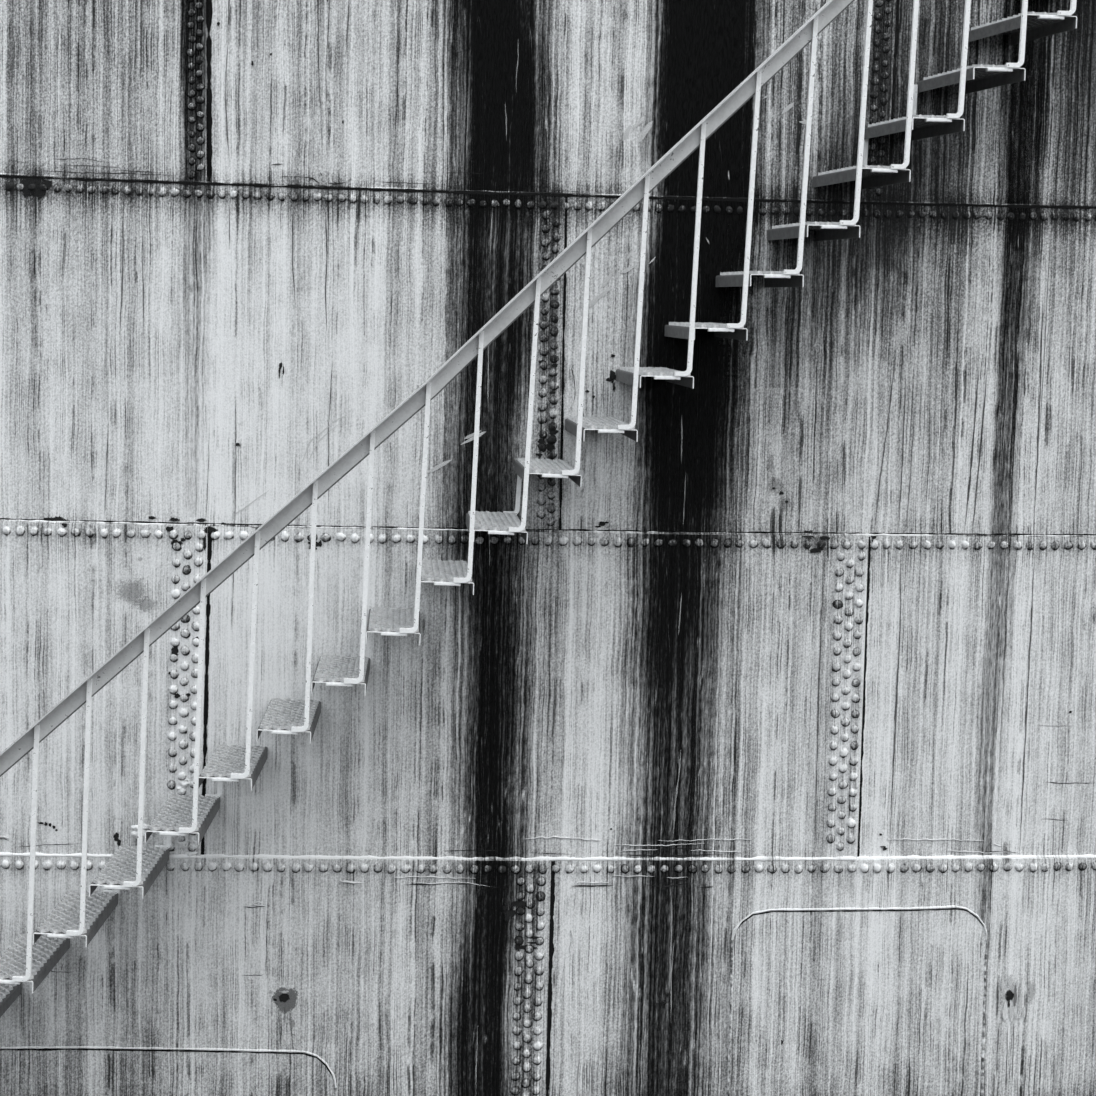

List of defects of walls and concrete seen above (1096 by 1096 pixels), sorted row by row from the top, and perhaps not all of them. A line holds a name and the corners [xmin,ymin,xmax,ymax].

water stain [436,302,546,1096]
water stain [435,0,559,358]
water stain [615,0,978,1096]